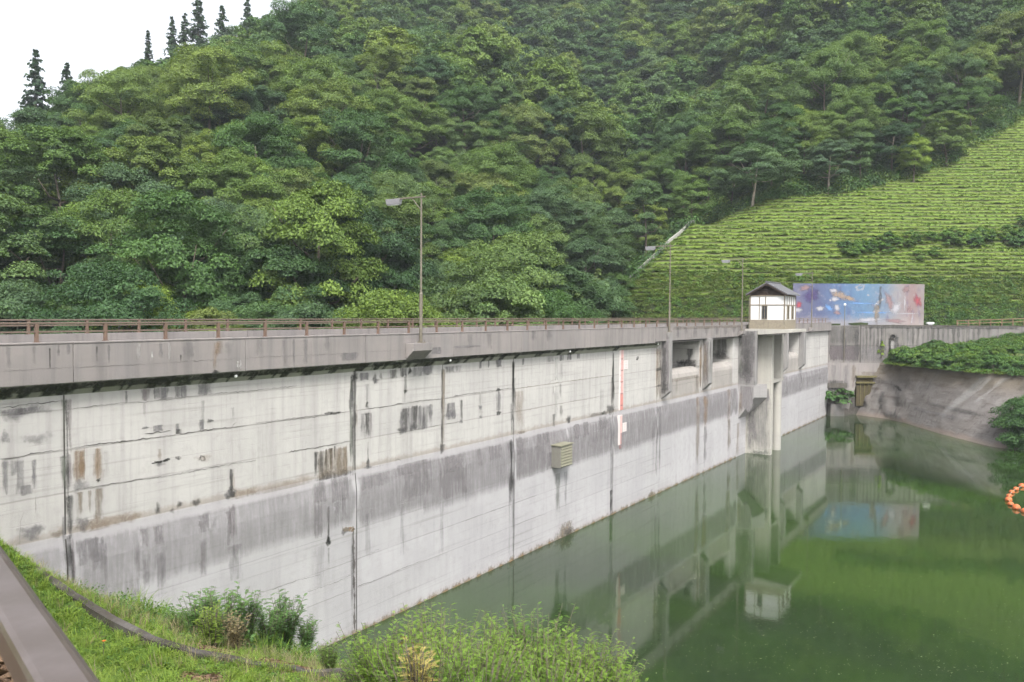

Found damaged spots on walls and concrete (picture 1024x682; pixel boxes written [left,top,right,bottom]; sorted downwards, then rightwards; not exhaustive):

damp [0,337,669,544]
damp [389,334,754,510]
rust [313,456,735,653]